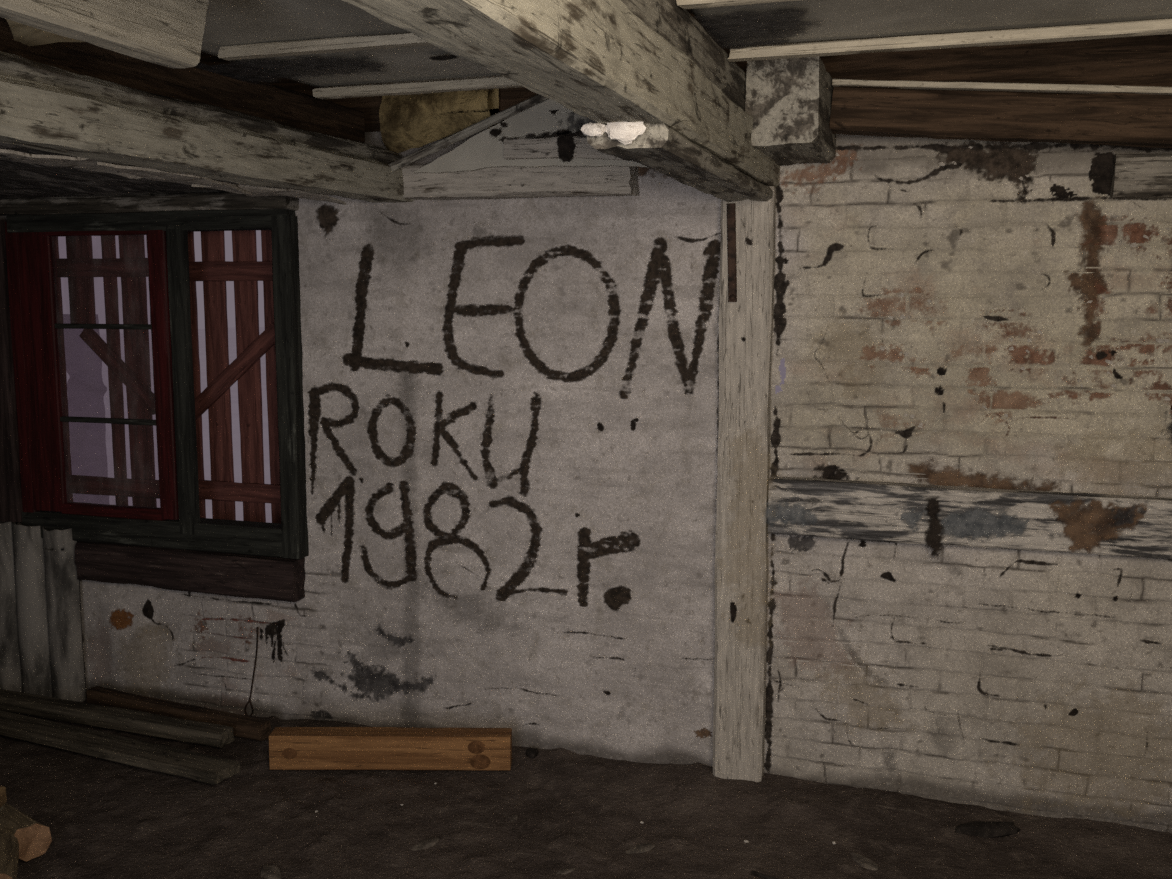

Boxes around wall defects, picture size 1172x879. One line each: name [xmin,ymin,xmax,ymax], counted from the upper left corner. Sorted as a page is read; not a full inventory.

spalling [937,141,1038,201]
spalling [1050,184,1077,201]
spalling [1089,152,1114,196]
peeling [1083,216,1172,248]
rust [1068,201,1107,346]
peeling [980,314,1055,372]
peeling [862,344,946,413]
peeling [968,330,1172,421]
damp [314,671,364,698]
damp [392,678,433,694]